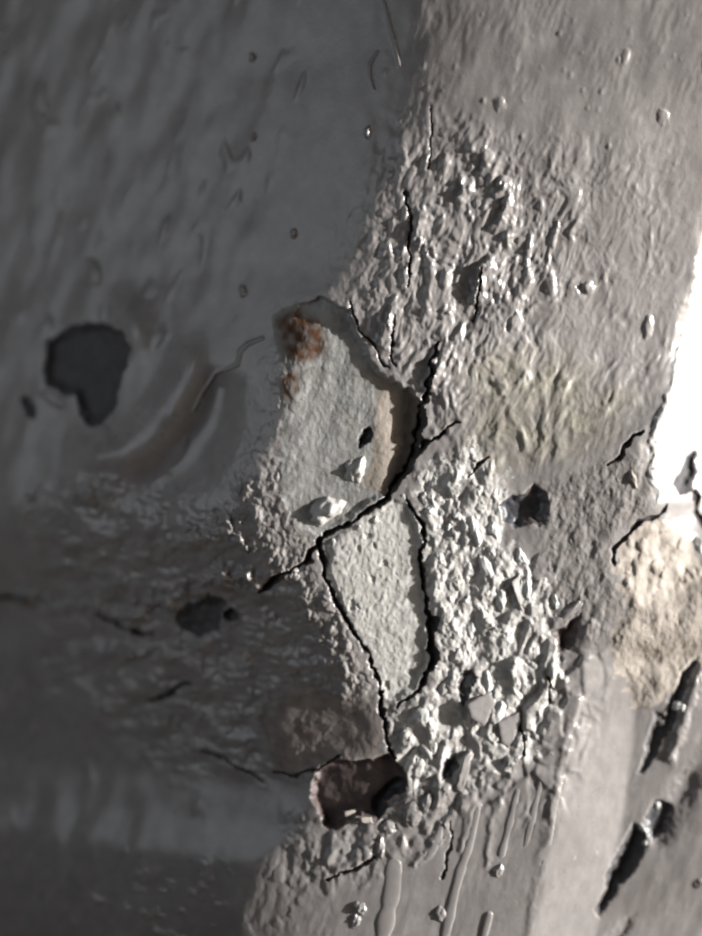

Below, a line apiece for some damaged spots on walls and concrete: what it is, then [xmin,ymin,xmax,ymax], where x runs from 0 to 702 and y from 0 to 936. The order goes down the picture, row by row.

corrosion [271,302,336,410]
crack [350,301,397,369]
crack [606,431,645,466]
crack [259,341,461,760]
spalling [229,246,702,894]
crack [611,504,668,567]
crack [692,489,702,528]
crack [201,750,341,783]
spalling [594,799,675,916]